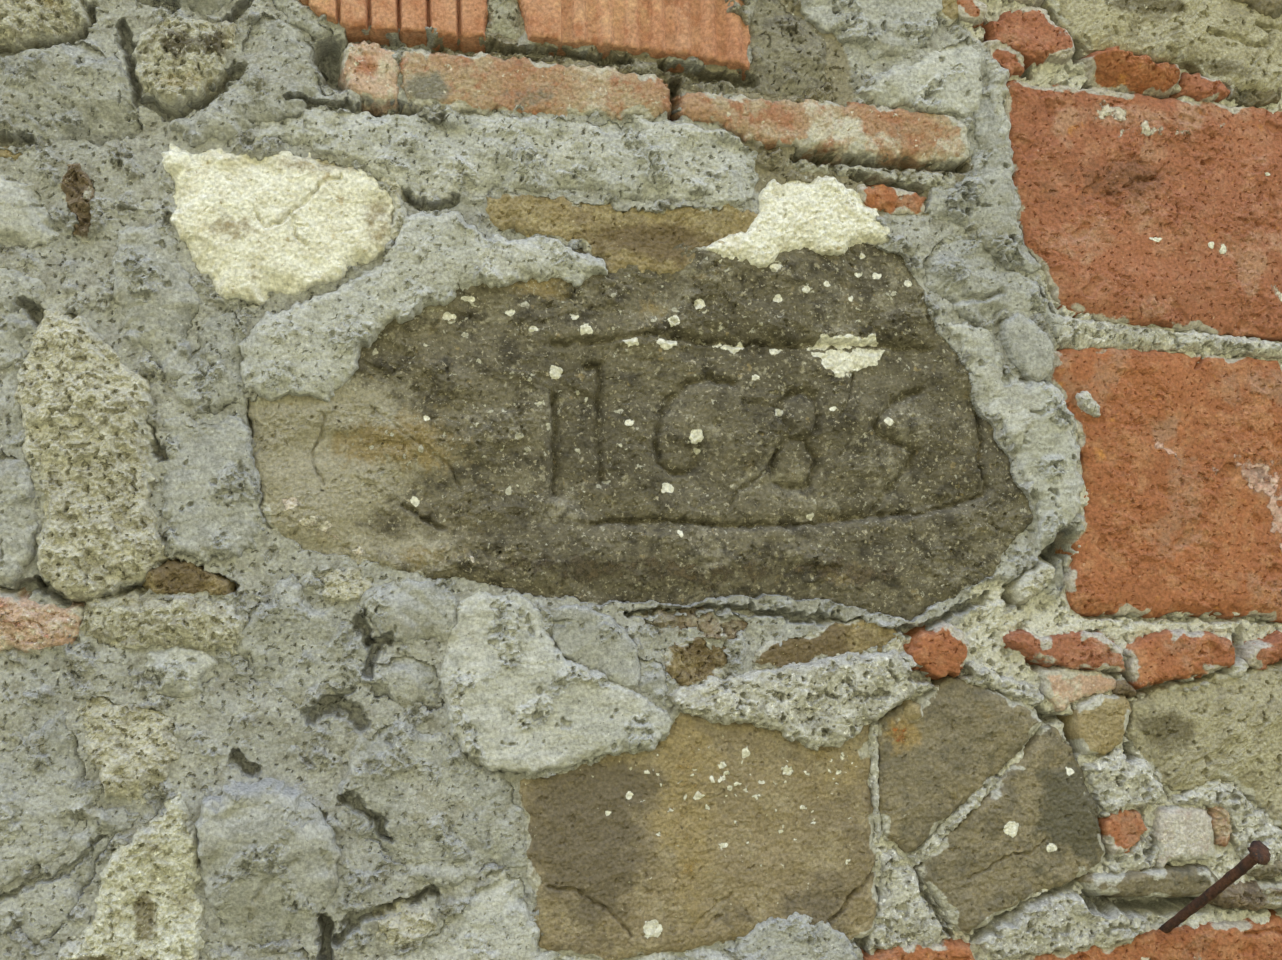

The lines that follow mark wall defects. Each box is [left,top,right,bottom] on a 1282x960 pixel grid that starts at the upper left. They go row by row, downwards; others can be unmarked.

crack [317,884,441,960]